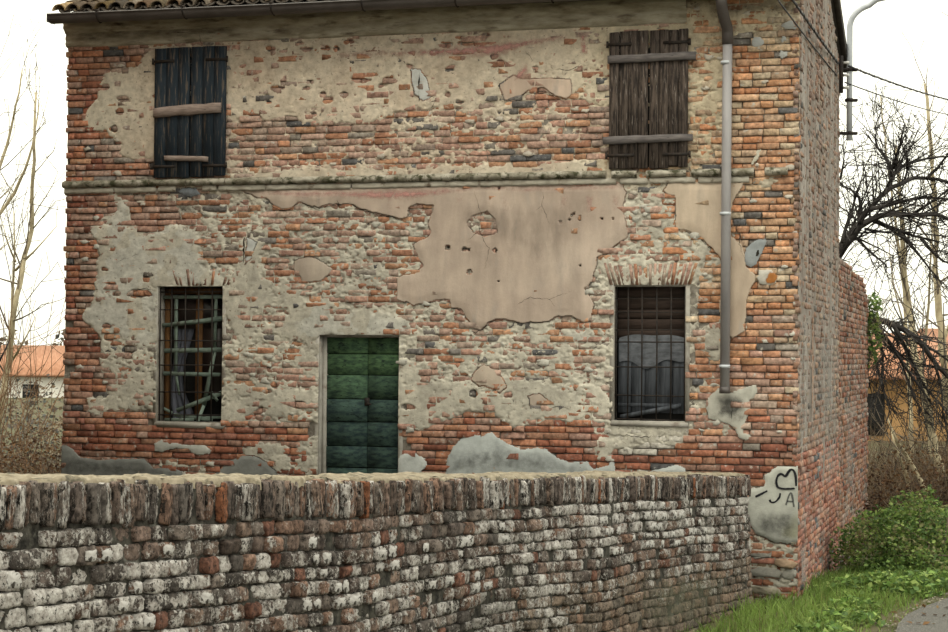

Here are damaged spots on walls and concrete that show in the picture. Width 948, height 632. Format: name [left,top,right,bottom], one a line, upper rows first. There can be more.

peeling [62,0,801,488]